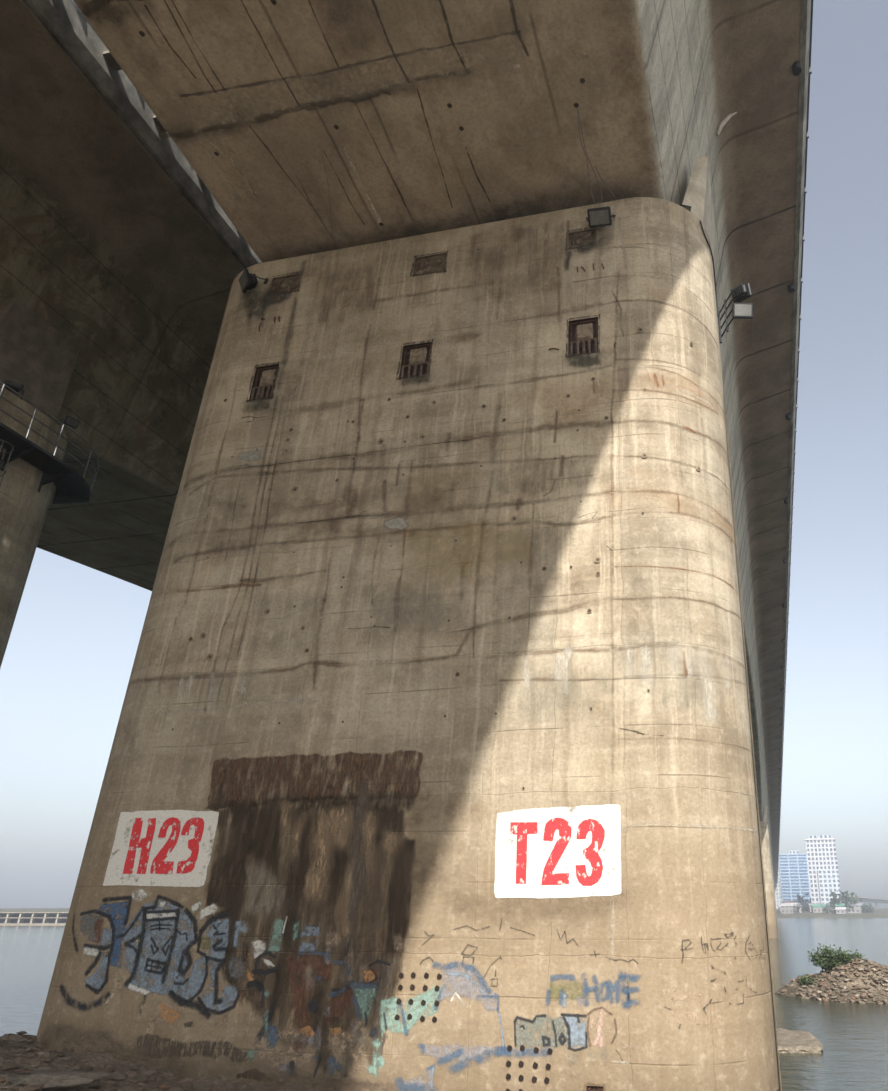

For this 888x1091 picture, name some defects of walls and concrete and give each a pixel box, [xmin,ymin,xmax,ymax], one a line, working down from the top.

water stain [160,30,520,137]
water stain [278,299,297,386]
water stain [539,417,600,442]
water stain [221,569,273,589]
water stain [526,648,596,694]